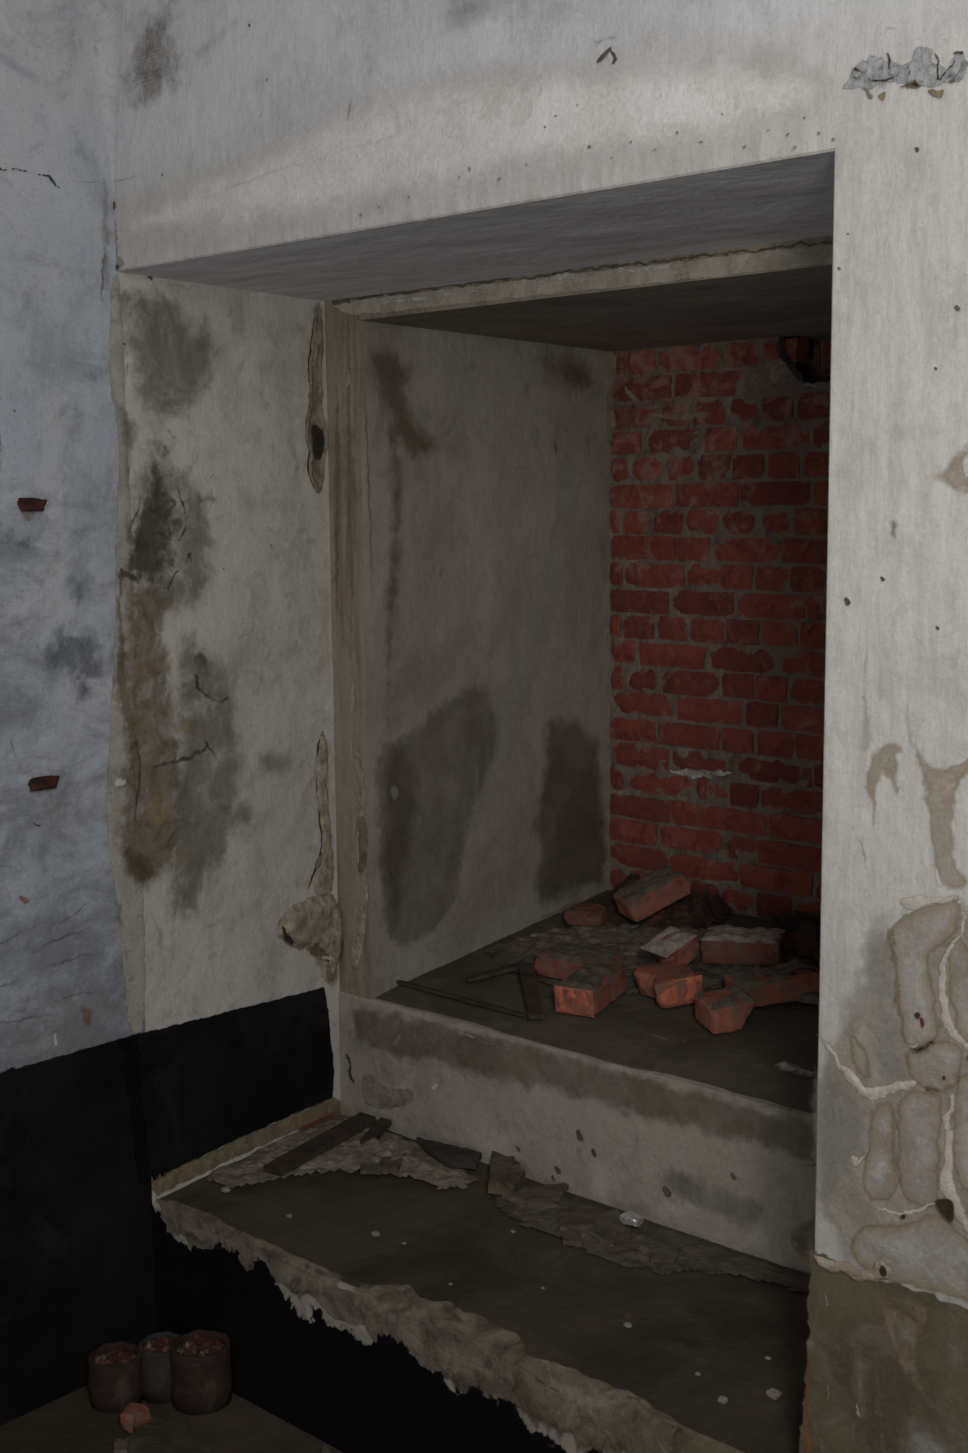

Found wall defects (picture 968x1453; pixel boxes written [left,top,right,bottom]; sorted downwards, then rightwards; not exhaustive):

peeling [843,47,968,101]
crack [0,167,92,188]
water stain [121,297,208,410]
water stain [115,464,246,907]
water stain [538,725,605,900]
peeling [791,895,968,1453]
spalling [148,1097,745,1453]